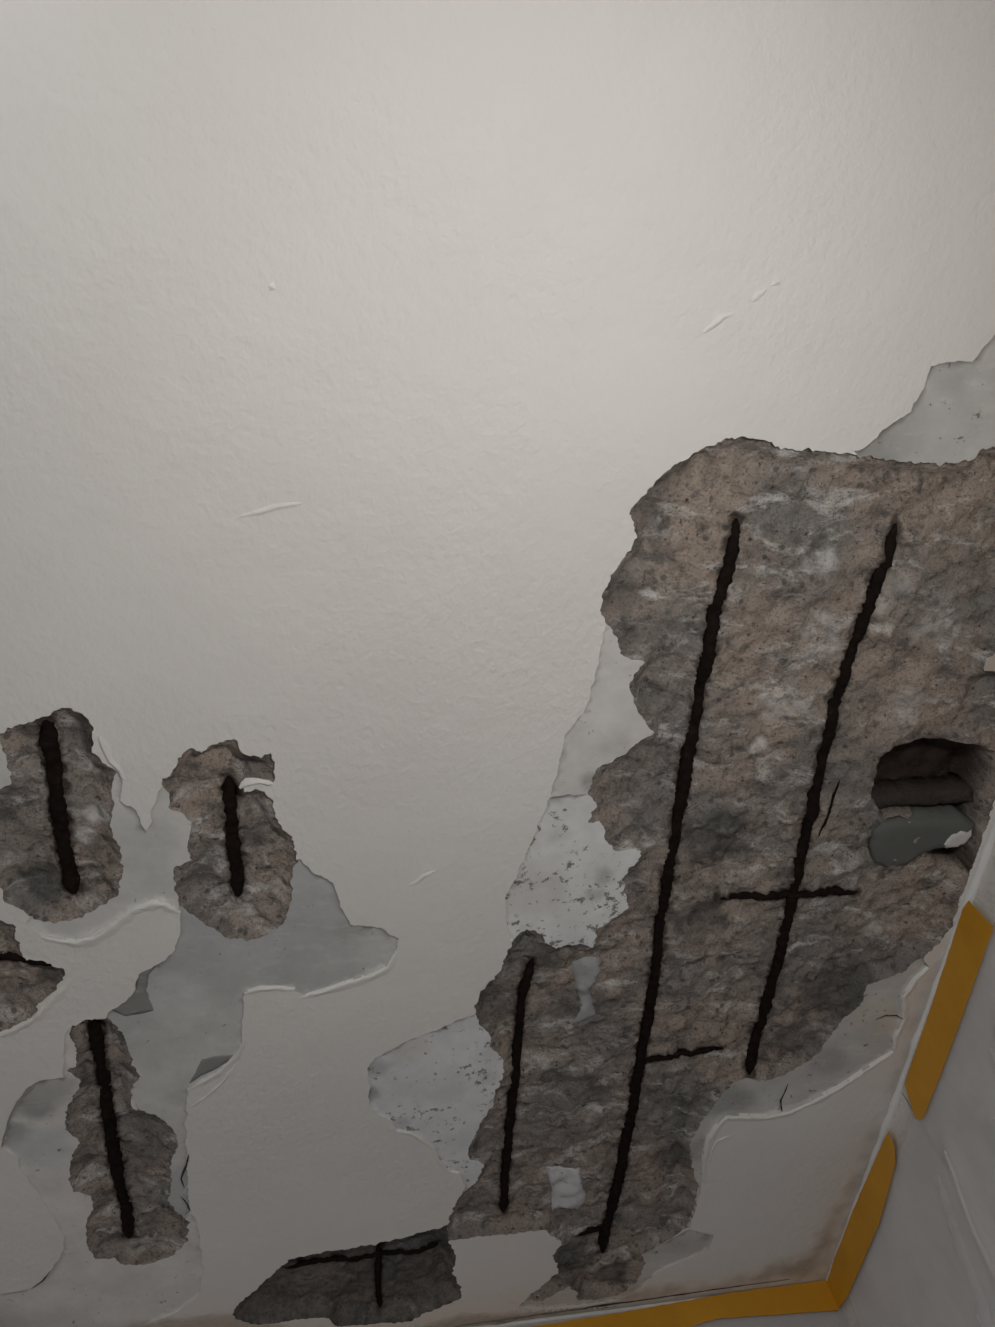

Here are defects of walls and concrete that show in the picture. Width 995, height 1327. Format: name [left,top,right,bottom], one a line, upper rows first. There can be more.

peeling [0,708,398,1327]
spalling [232,335,995,1327]